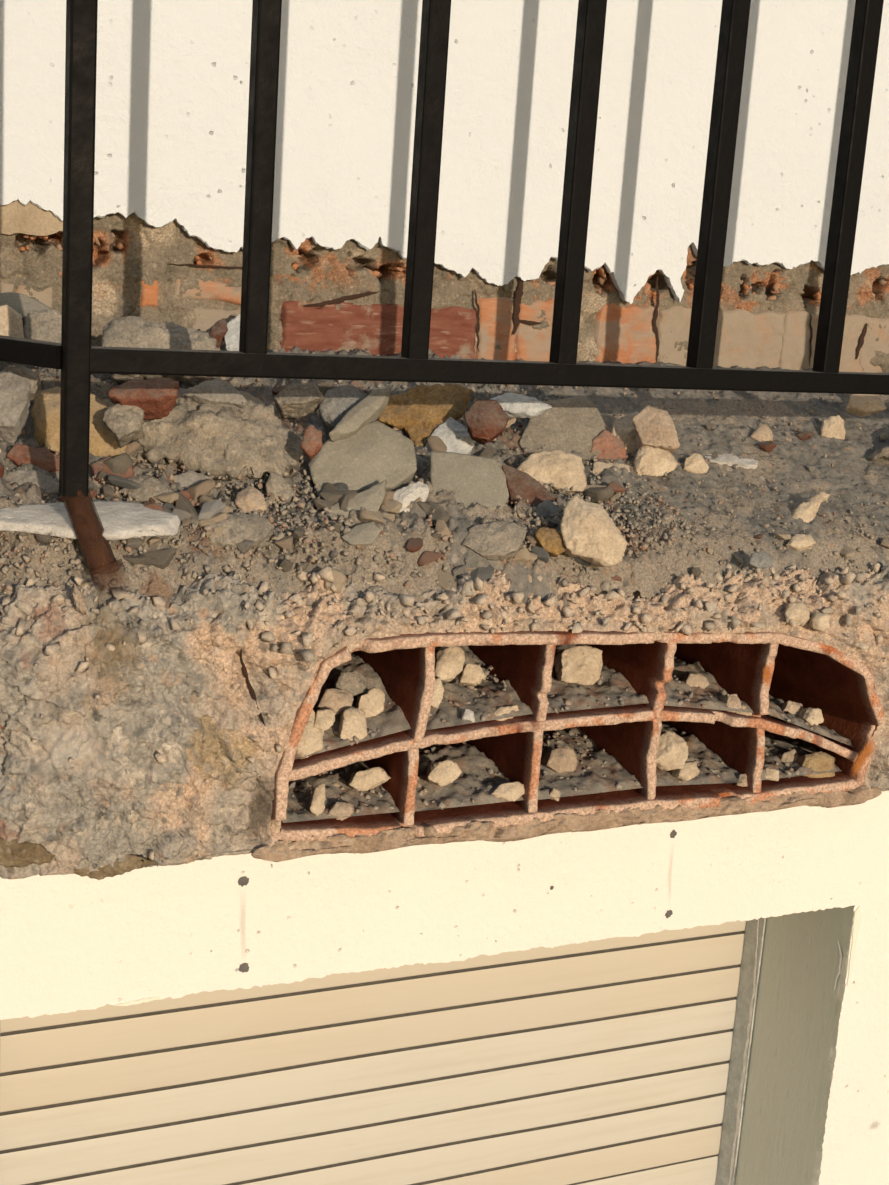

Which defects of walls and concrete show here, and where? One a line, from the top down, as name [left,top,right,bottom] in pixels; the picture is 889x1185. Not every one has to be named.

flaking render [0,200,63,313]
flaking render [91,213,243,346]
flaking render [267,237,407,356]
flaking render [429,258,557,362]
flaking render [577,245,697,366]
flaking render [713,261,824,370]
flaking render [839,264,889,373]
corrosion [61,490,122,578]
spalling [173,470,211,487]
spalling [266,471,296,506]
spalling [324,480,387,525]
spalling [0,492,889,880]